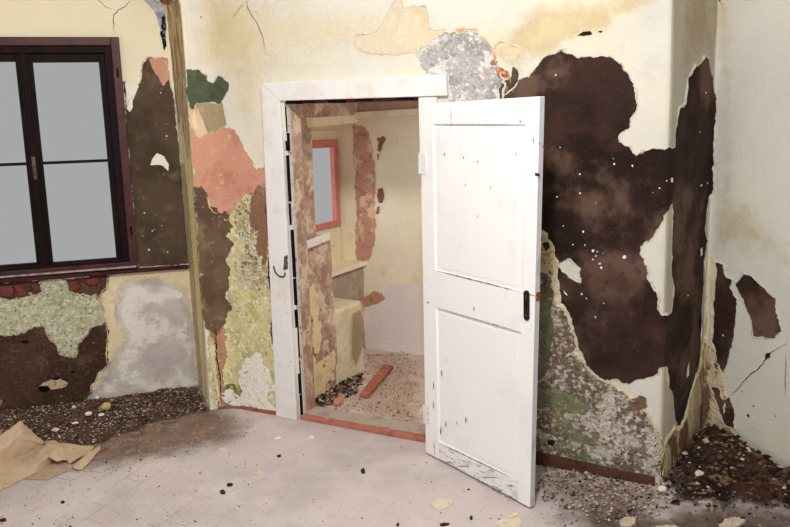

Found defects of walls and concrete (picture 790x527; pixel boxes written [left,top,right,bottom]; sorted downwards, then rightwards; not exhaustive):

leakage [218,2,269,49]
leakage [513,7,608,55]
peeling [0,0,276,473]
peeling [332,125,386,308]
peeling [354,0,782,483]
crack [731,343,787,395]